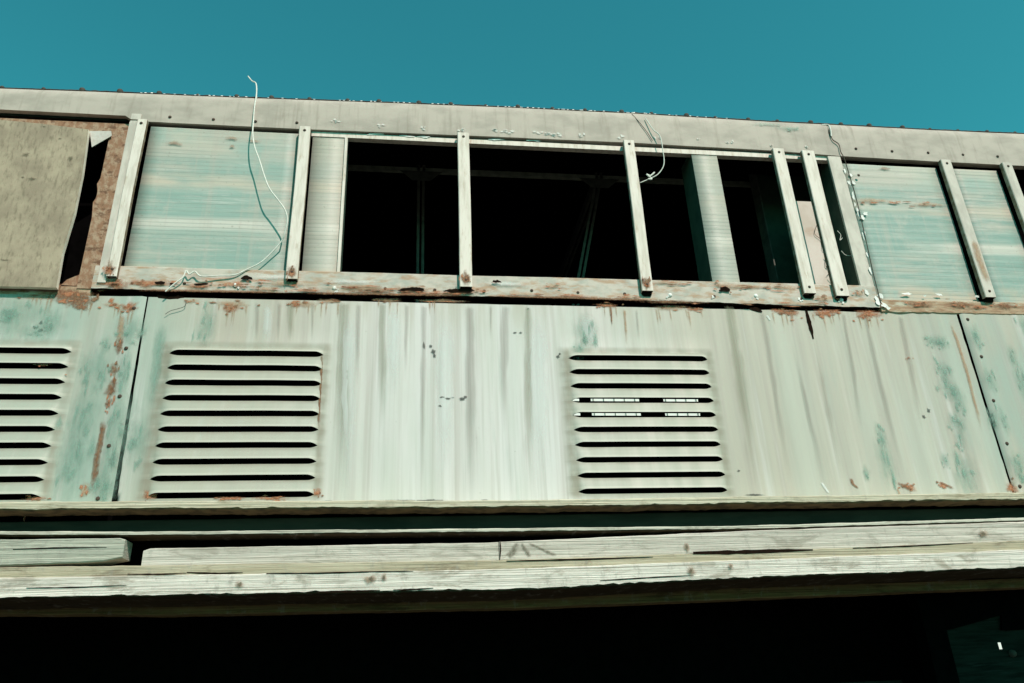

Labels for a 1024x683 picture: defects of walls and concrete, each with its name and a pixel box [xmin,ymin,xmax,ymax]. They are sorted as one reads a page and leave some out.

corrosion [500,276,703,322]
corrosion [714,280,840,322]
corrosion [17,264,486,413]
corrosion [953,330,978,413]
corrosion [80,426,105,497]